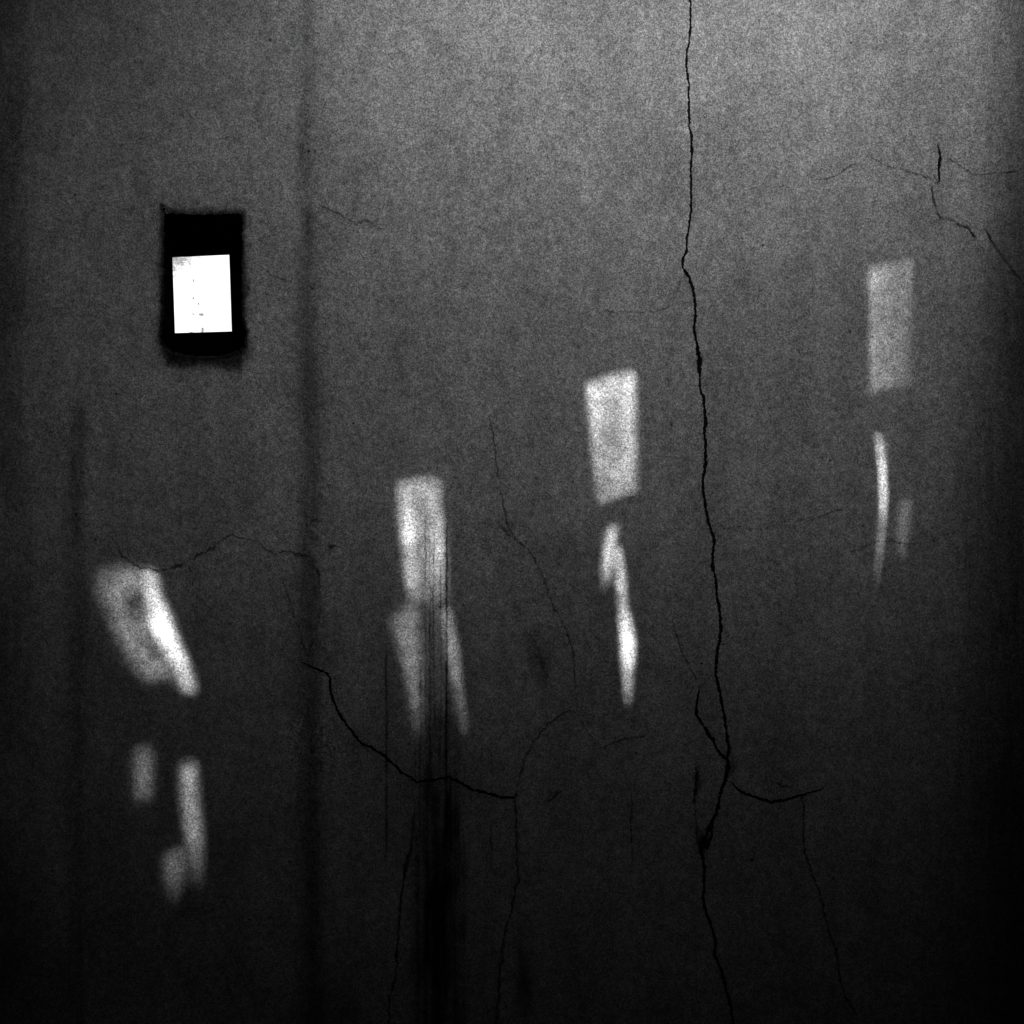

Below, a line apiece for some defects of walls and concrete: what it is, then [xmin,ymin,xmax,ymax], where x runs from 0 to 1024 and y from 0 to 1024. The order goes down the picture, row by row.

crack [811,144,1017,276]
crack [111,534,336,617]
crack [489,416,576,684]
crack [608,0,856,1024]
crack [300,640,644,1024]